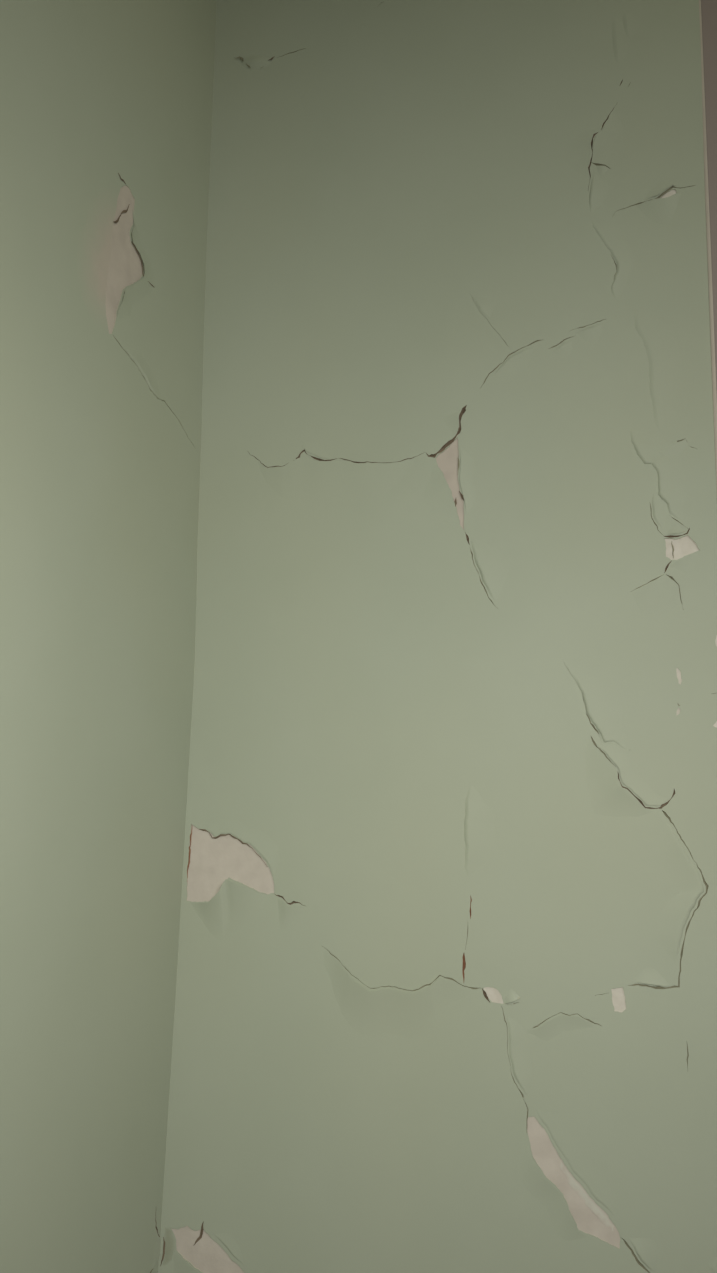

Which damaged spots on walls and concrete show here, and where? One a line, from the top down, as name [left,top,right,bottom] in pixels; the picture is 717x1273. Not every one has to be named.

crack [617,180,695,225]
peeling [77,173,154,338]
crack [426,405,467,458]
spalling [664,525,699,573]
crack [563,661,675,817]
spalling [186,819,280,941]
crack [150,1220,177,1273]
crack [622,1238,659,1273]